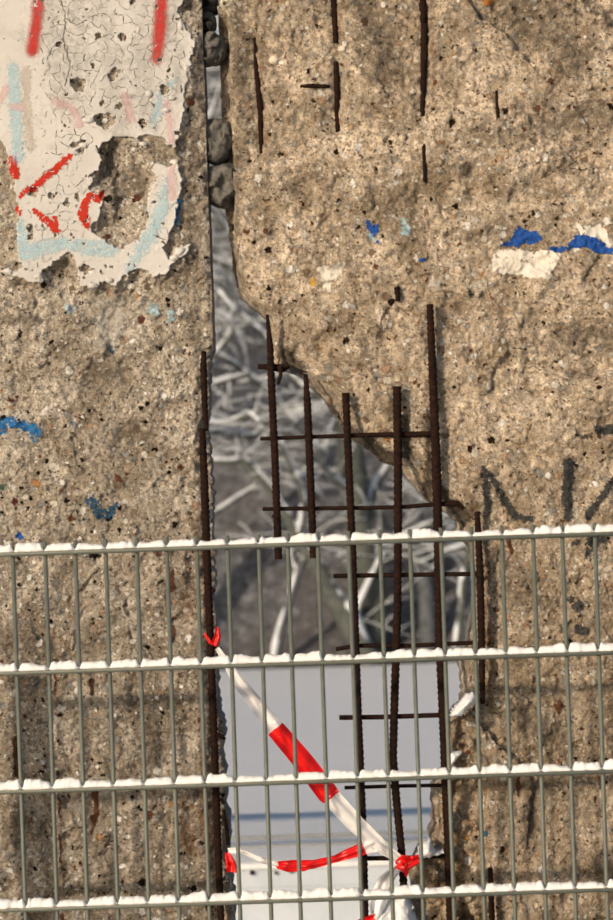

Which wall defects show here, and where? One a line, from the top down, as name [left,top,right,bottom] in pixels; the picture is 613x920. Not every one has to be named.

crack [23,0,185,267]
spalling [0,0,236,920]
spalling [217,0,613,920]